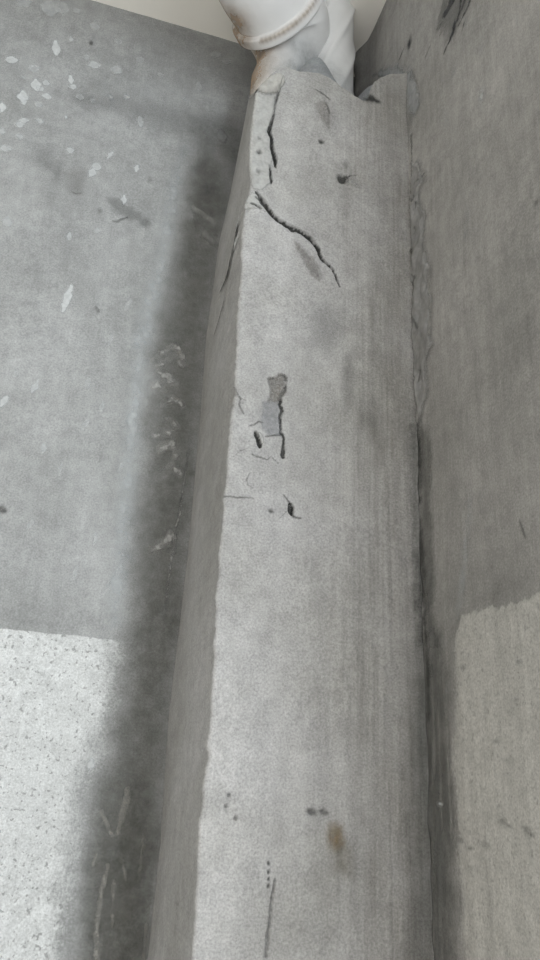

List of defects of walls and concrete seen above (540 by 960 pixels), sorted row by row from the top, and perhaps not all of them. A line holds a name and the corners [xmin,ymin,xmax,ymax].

crack [215,92,336,331]
damp [149,386,191,597]
peeling [250,374,286,459]